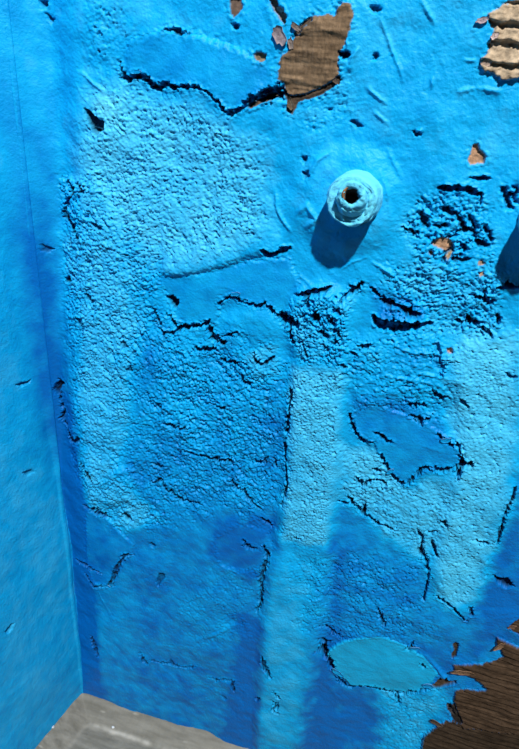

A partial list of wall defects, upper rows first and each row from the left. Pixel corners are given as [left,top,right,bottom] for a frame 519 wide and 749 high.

crack [118,60,287,118]
spalling [247,0,354,116]
spalling [475,0,519,81]
crack [436,174,492,207]
peeling [467,143,486,166]
crack [454,279,519,338]
crack [149,281,475,533]
crack [473,486,517,547]
crack [242,539,271,613]
crack [417,520,474,623]
spalling [507,619,519,635]
spalling [328,636,519,749]